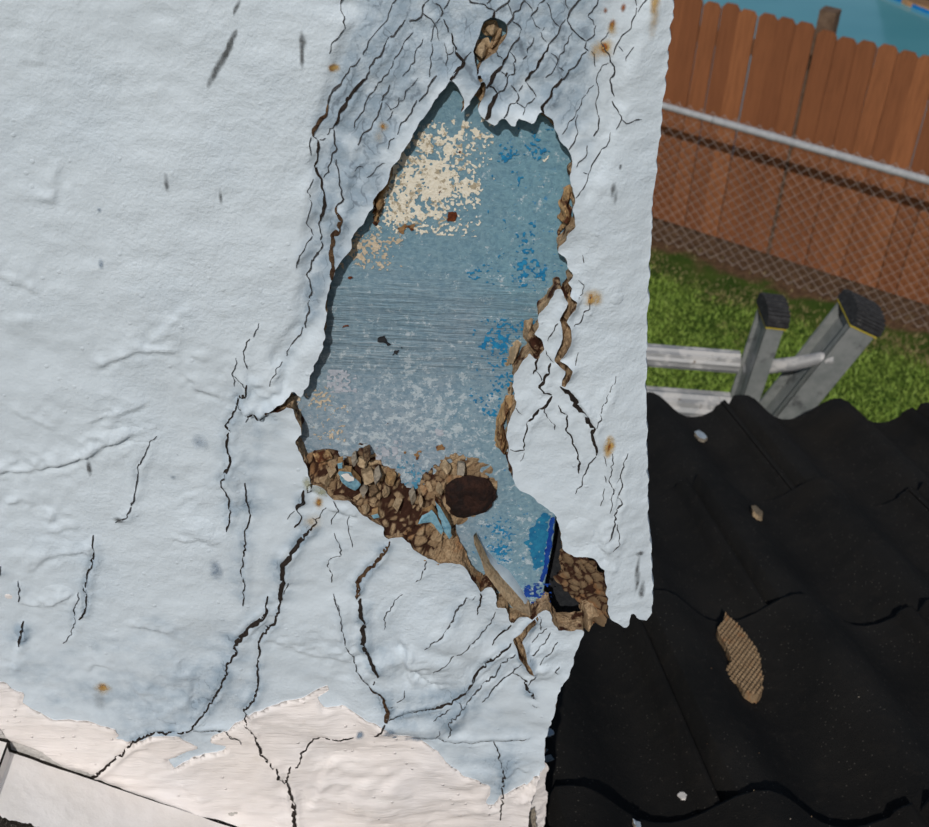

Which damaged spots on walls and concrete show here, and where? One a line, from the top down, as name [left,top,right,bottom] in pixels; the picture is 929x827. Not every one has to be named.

peeling [337,112,554,271]
crack [269,0,647,387]
peeling [502,219,563,291]
spalling [557,184,572,236]
spalling [469,318,542,473]
crack [510,255,628,552]
spalling [291,369,555,617]
crack [63,535,94,644]
crack [91,323,560,827]
spalling [580,600,599,632]